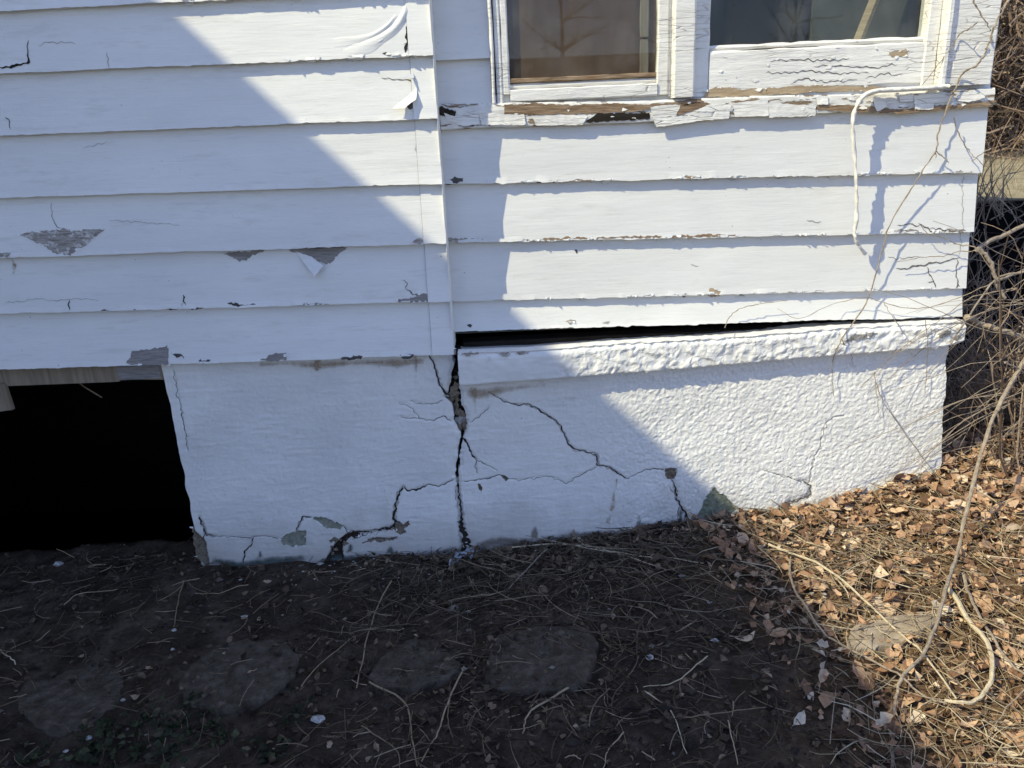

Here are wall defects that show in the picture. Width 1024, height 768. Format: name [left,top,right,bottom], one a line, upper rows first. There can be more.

crack [0,41,75,69]
crack [717,46,903,88]
peeling [888,49,908,59]
peeling [439,84,985,256]
peeling [18,215,104,256]
peeling [219,250,267,262]
peeling [283,246,347,276]
peeling [396,280,428,303]
peeling [126,346,184,366]
crack [344,345,689,548]
crack [198,516,311,563]